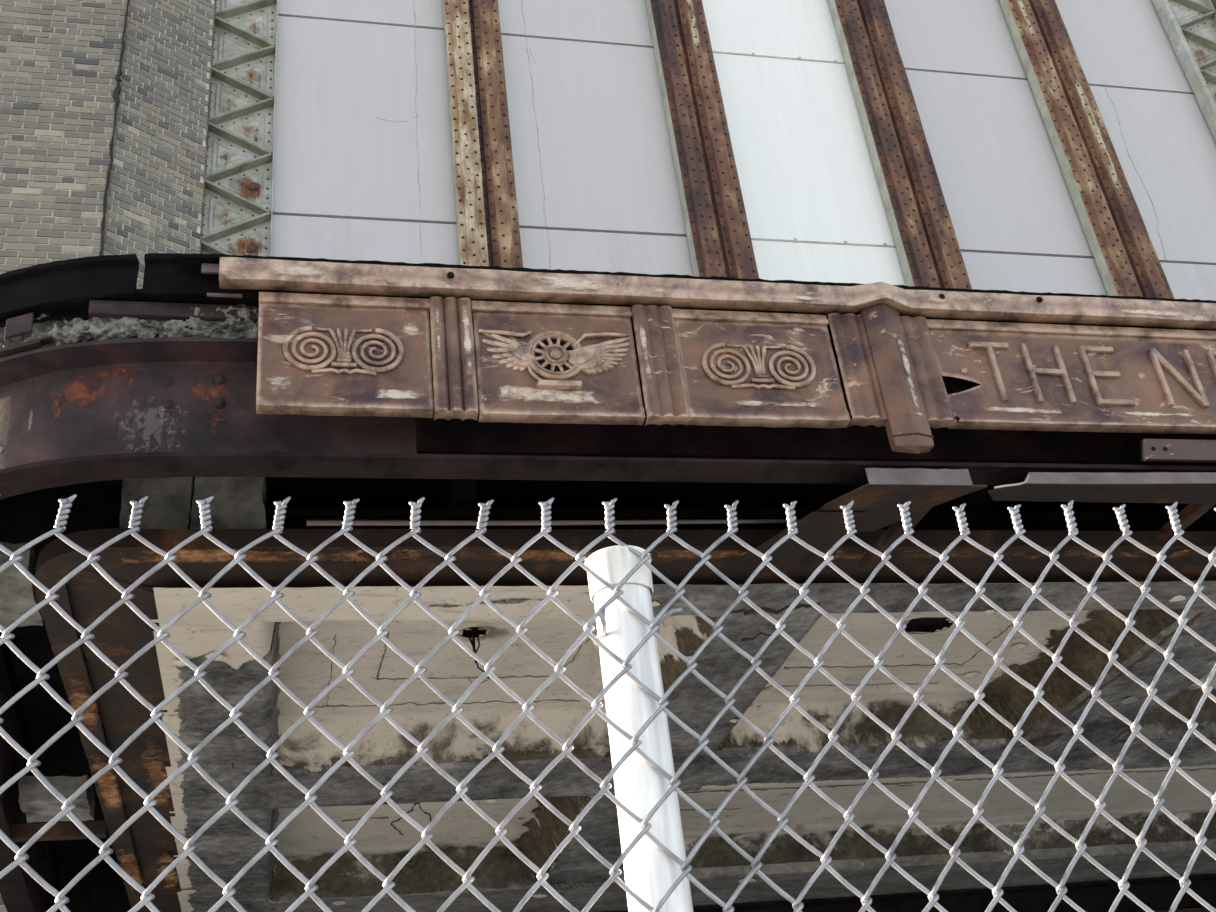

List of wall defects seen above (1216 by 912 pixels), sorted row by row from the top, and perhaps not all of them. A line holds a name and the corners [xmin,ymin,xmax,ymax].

spalling [0,303,259,359]
crack [314,631,597,707]
rust [69,679,97,730]
leakage [717,732,763,759]
leakage [774,698,1062,757]
leakage [1110,687,1216,743]
rust [88,755,120,808]
rust [144,752,170,803]
rust [118,849,143,889]
rust [155,854,179,894]
leakage [689,824,1001,878]
leakage [1029,812,1216,859]